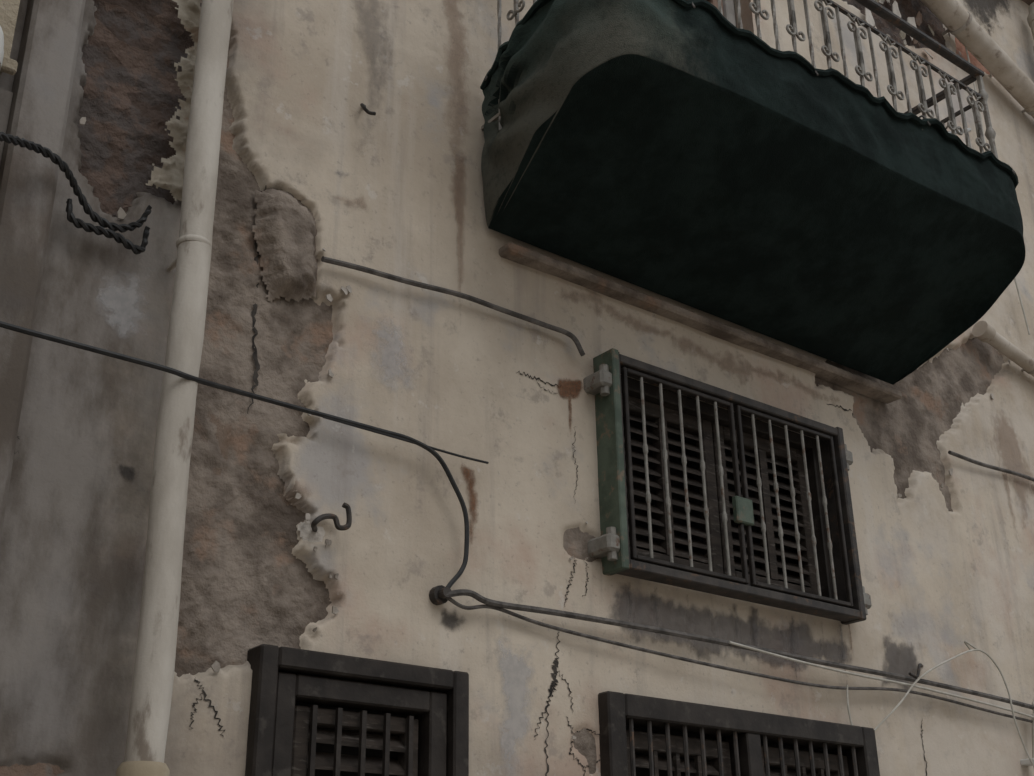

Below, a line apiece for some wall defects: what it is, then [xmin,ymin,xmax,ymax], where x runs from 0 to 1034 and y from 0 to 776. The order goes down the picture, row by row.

crack [247,236,260,414]
flaking render [174,86,352,677]
corrosion [558,380,582,427]
flaking render [815,338,1010,512]
crack [564,558,589,606]
damp [614,587,847,667]
crack [189,677,225,737]
crack [534,632,601,776]
flaking render [572,728,597,774]